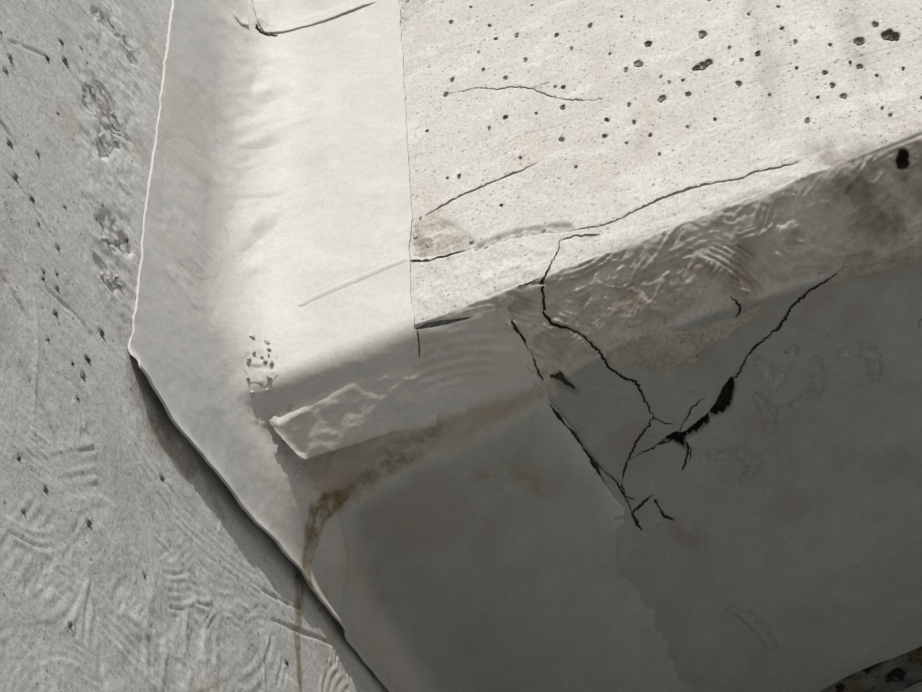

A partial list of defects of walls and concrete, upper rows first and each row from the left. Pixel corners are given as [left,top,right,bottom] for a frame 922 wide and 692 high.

crack [426,162,537,215]
crack [411,249,470,262]
crack [511,162,836,531]
corrosion [295,492,343,623]